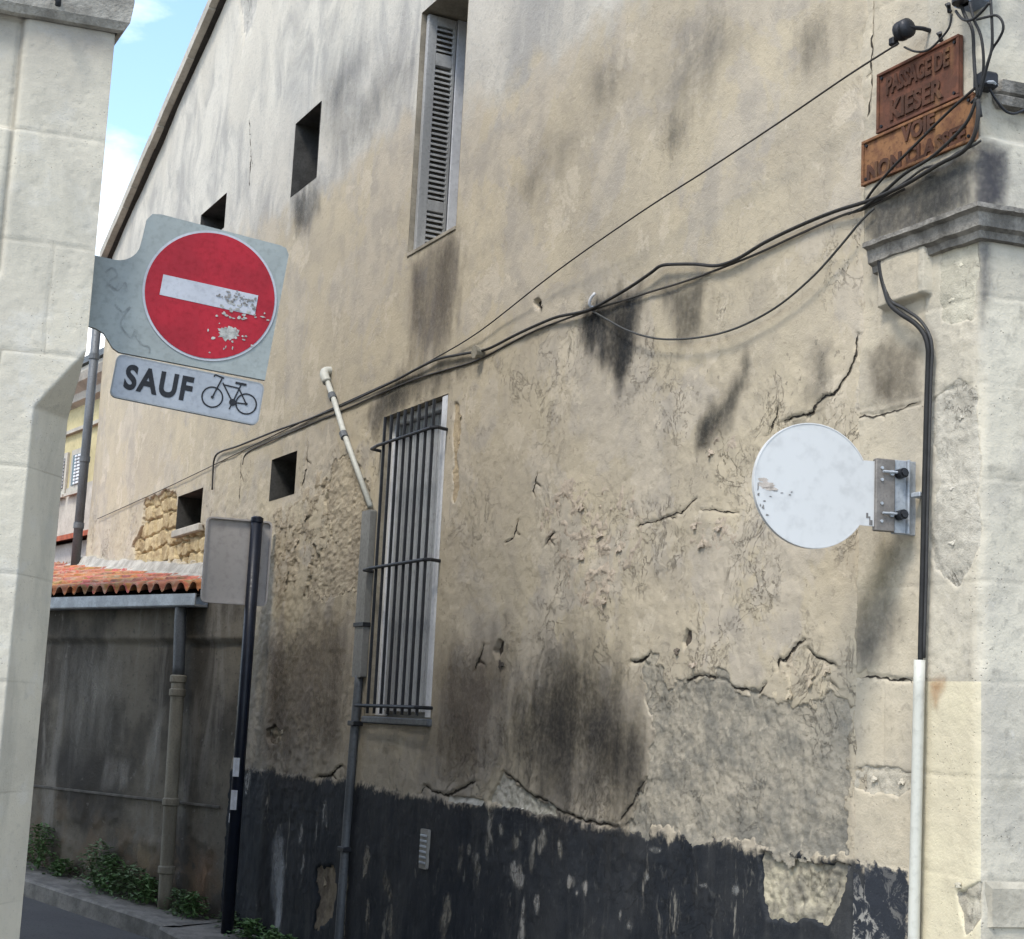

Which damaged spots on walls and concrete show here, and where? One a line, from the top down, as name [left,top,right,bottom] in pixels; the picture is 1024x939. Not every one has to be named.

leakage [584,296,637,381]
leakage [700,384,738,443]
crack [769,335,858,434]
flaking render [134,490,205,564]
flaking render [307,451,370,601]
crack [638,499,735,527]
crack [687,640,837,694]
flaking render [448,773,557,887]
crack [505,772,646,828]
flaking render [626,648,911,926]
peeling [314,865,348,936]
peeling [518,896,539,939]